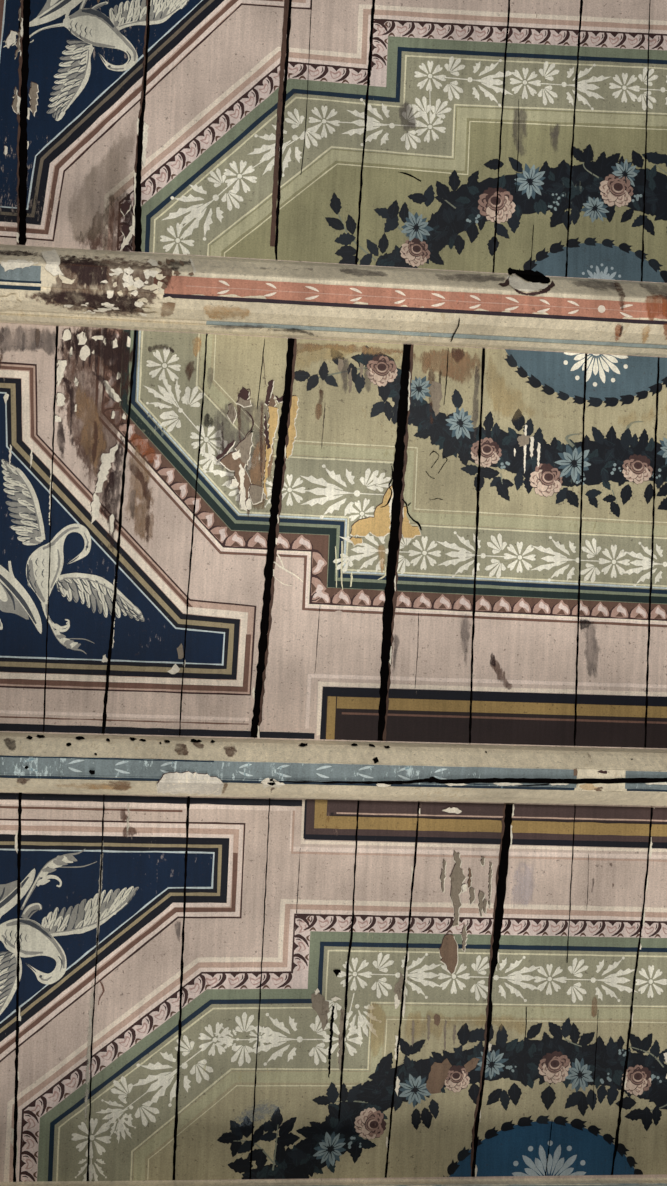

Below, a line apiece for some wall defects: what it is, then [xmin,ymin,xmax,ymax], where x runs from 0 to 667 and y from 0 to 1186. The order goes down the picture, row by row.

crack [16,0,31,245]
crack [132,0,151,252]
peeling [55,328,131,422]
peeling [90,443,118,532]
peeling [64,258,196,321]
peeling [216,379,299,511]
crack [242,338,297,738]
peeling [349,485,421,546]
crack [377,344,448,741]
crack [469,348,485,743]
crack [249,776,667,1179]
peeling [439,850,493,975]